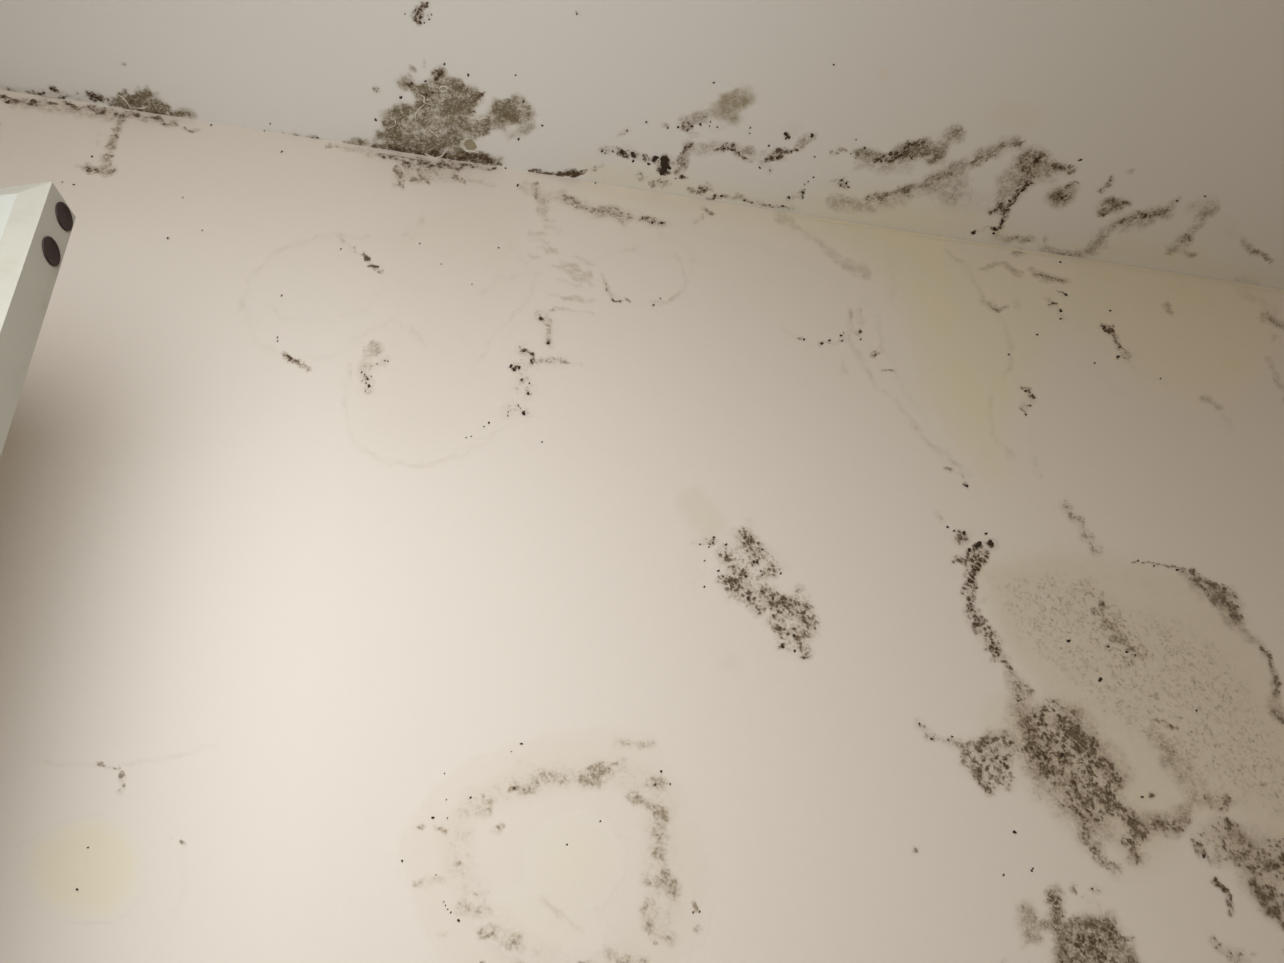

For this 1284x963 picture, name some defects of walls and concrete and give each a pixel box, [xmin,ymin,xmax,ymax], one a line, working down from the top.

damp [86,89,193,173]
damp [296,63,1284,492]
damp [671,483,818,659]
damp [918,506,1284,929]
damp [394,723,715,963]
damp [1022,887,1138,963]